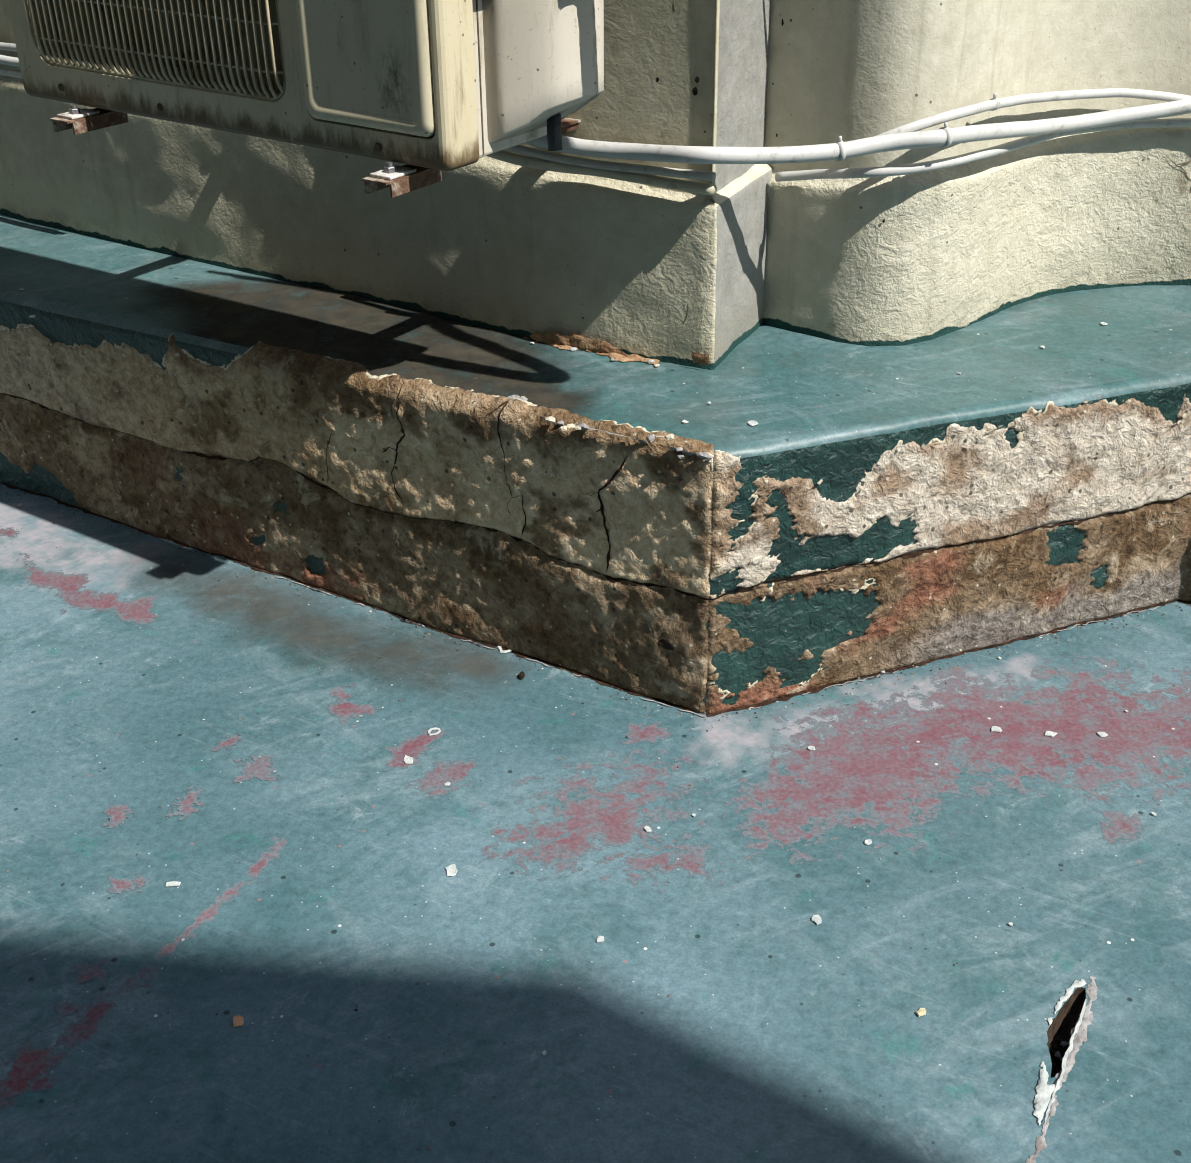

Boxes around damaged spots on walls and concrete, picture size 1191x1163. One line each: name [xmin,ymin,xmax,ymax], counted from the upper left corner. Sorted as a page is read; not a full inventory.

leakage [158,282,586,413]
crack [0,382,1191,600]
crack [0,482,1191,717]
peeling [0,324,1191,894]
crack [1025,976,1098,1163]